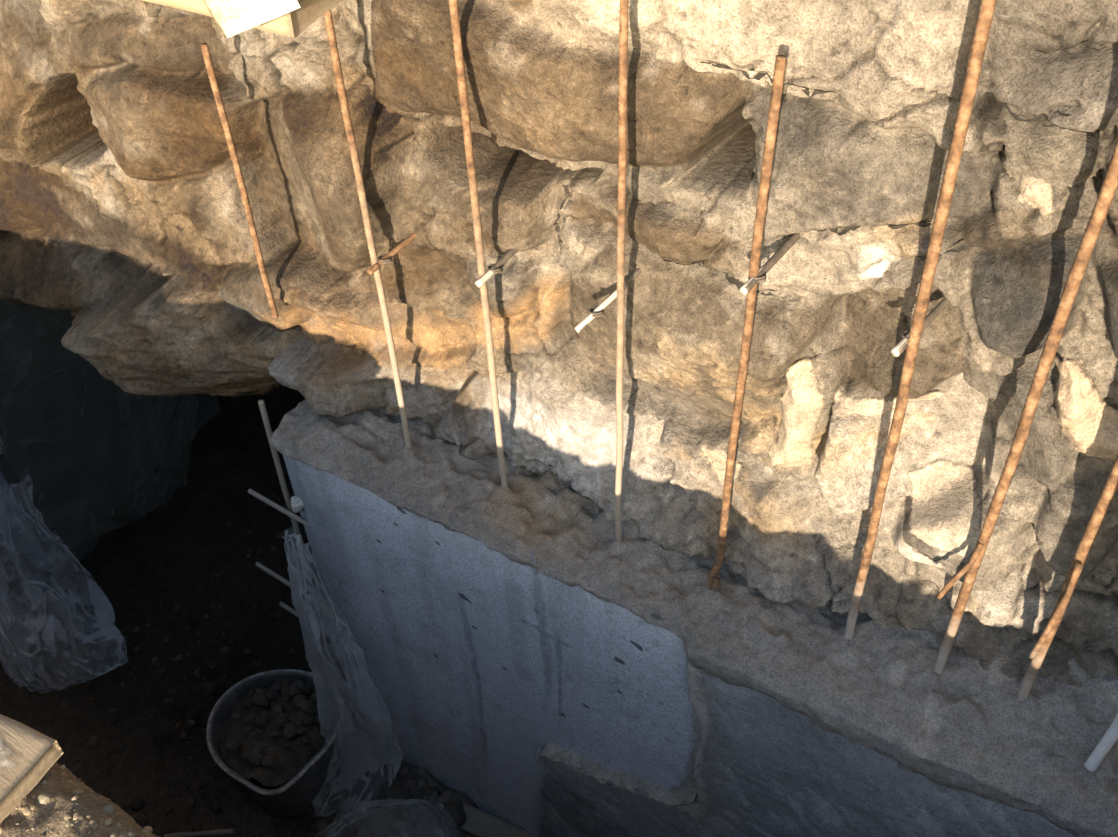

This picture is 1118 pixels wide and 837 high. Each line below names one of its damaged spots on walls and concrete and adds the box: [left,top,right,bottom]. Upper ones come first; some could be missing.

spalling [540,744,698,807]